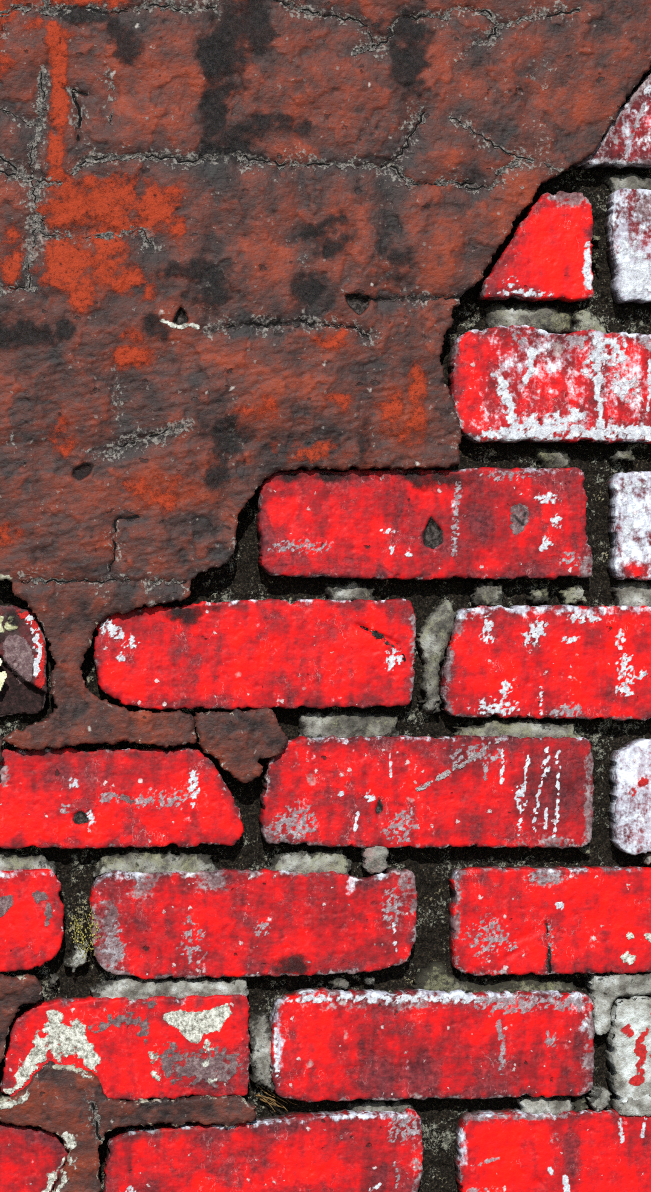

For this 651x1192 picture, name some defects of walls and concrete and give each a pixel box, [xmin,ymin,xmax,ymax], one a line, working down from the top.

damp [624,85,651,154]
damp [620,233,651,298]
spalling [160,307,200,329]
spalling [423,516,443,549]
damp [623,478,647,556]
peeling [0,610,45,715]
spalling [73,811,89,824]
peeling [620,932,651,965]
peeling [0,1001,247,1109]
peeling [621,1024,651,1086]
spalling [42,1131,76,1192]
damp [548,1167,570,1192]